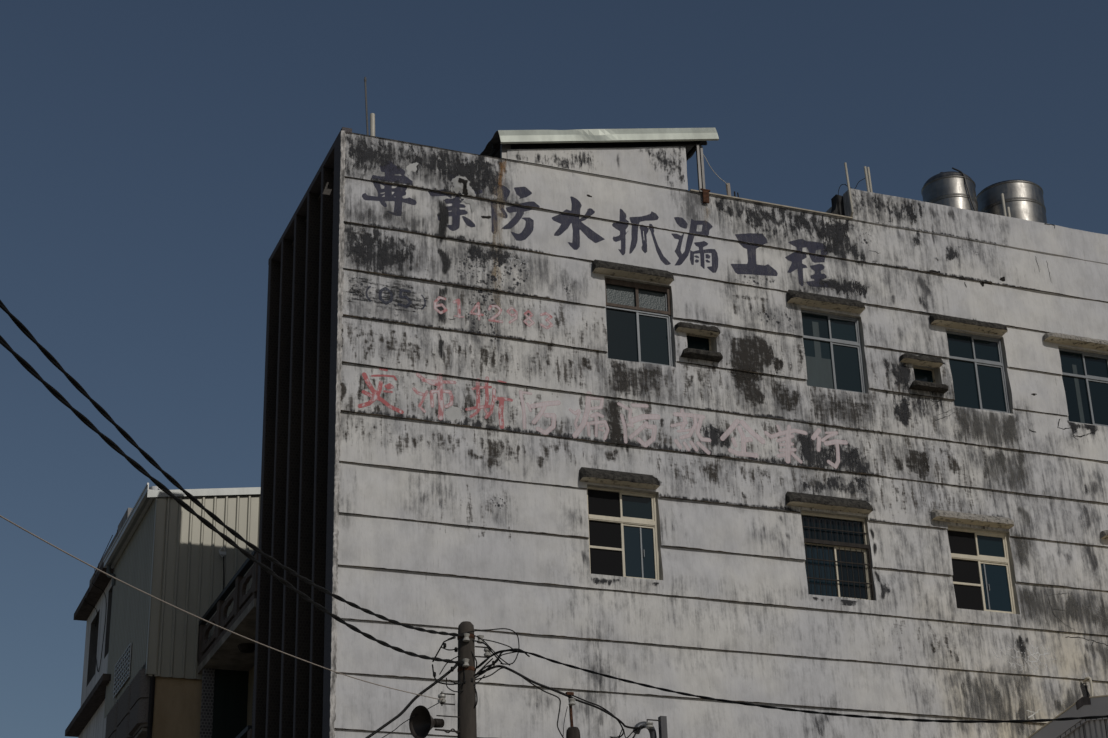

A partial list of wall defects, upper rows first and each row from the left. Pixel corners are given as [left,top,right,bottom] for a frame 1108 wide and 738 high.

leakage [535,154,592,169]
mould [646,147,684,184]
leakage [344,136,550,367]
leakage [350,362,881,554]
leakage [1019,588,1108,629]
leakage [1017,635,1028,658]
leakage [961,676,1028,732]
leakage [1057,683,1090,709]